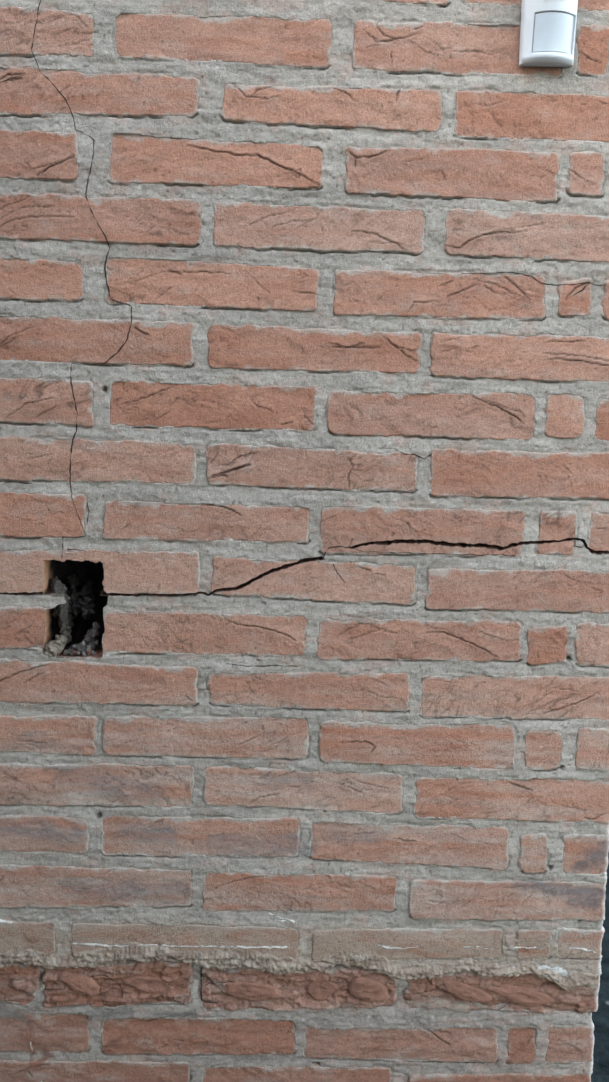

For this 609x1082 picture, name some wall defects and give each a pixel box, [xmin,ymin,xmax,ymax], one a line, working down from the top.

crack [0,0,132,552]
crack [0,588,54,596]
crack [100,538,609,597]
spalling [0,941,601,1014]